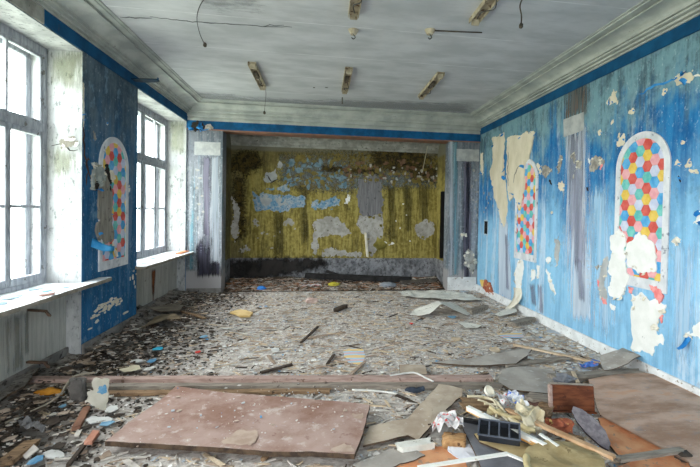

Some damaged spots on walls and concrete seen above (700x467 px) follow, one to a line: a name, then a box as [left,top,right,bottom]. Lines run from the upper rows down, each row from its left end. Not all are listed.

crack [121,17,288,27]
peeling [606,89,618,105]
peeling [91,175,118,257]
leakage [190,150,327,279]
peeling [252,150,438,258]
peeling [456,131,605,227]
peeling [88,297,129,330]
peeling [505,236,561,309]
peeling [595,229,667,356]